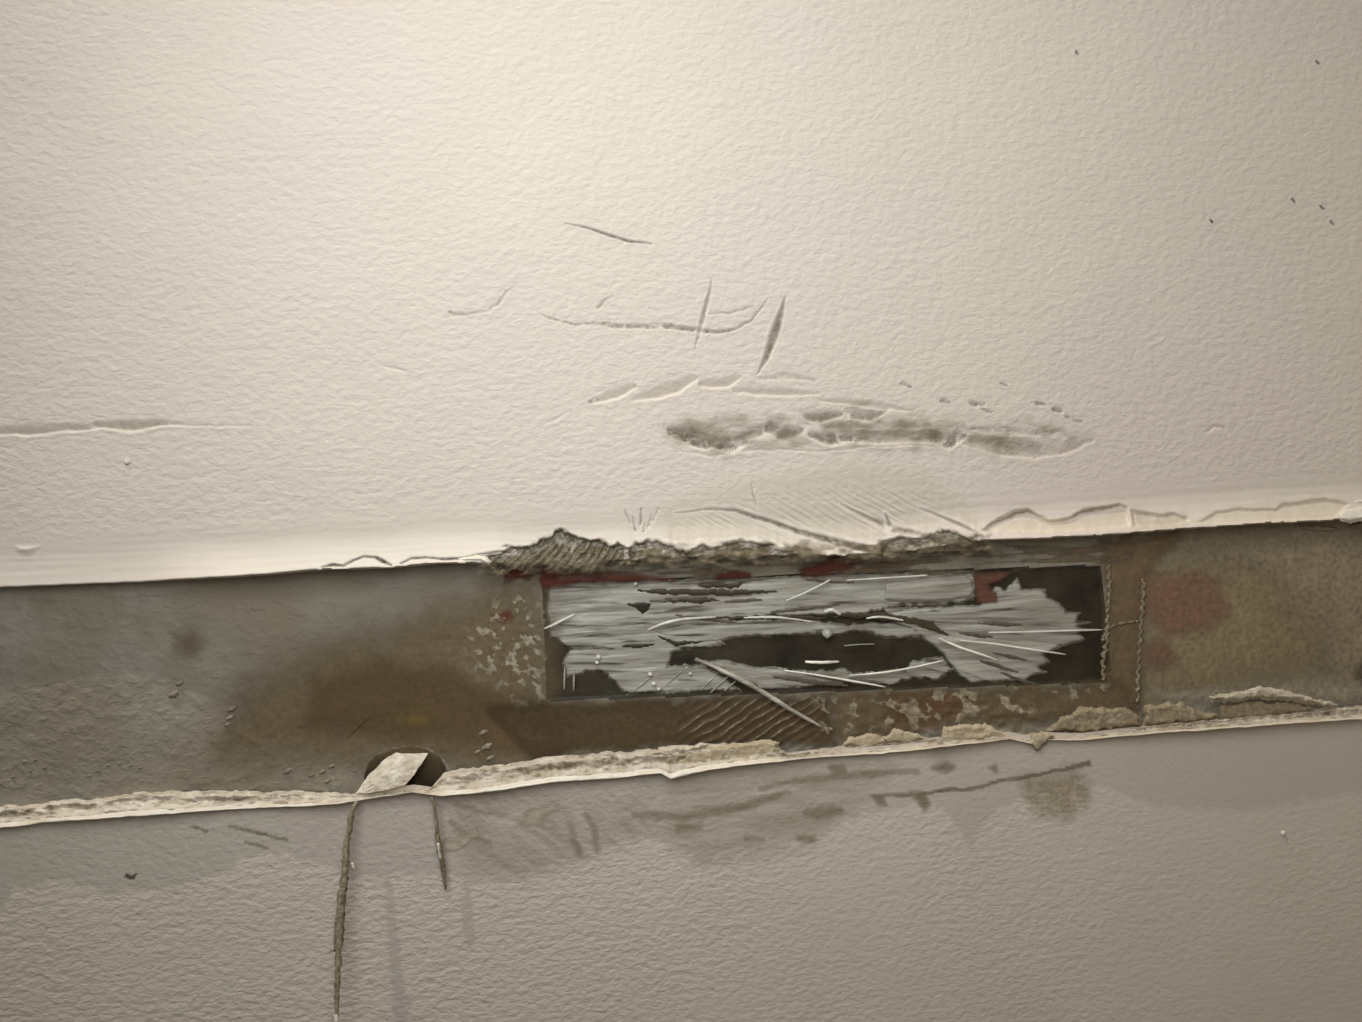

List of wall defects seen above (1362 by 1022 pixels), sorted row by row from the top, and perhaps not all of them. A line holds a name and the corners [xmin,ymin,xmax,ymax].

crack [0,414,254,441]
spalling [975,492,1362,539]
peeling [317,547,517,569]
water stain [225,531,1362,764]
spalling [0,686,1362,828]